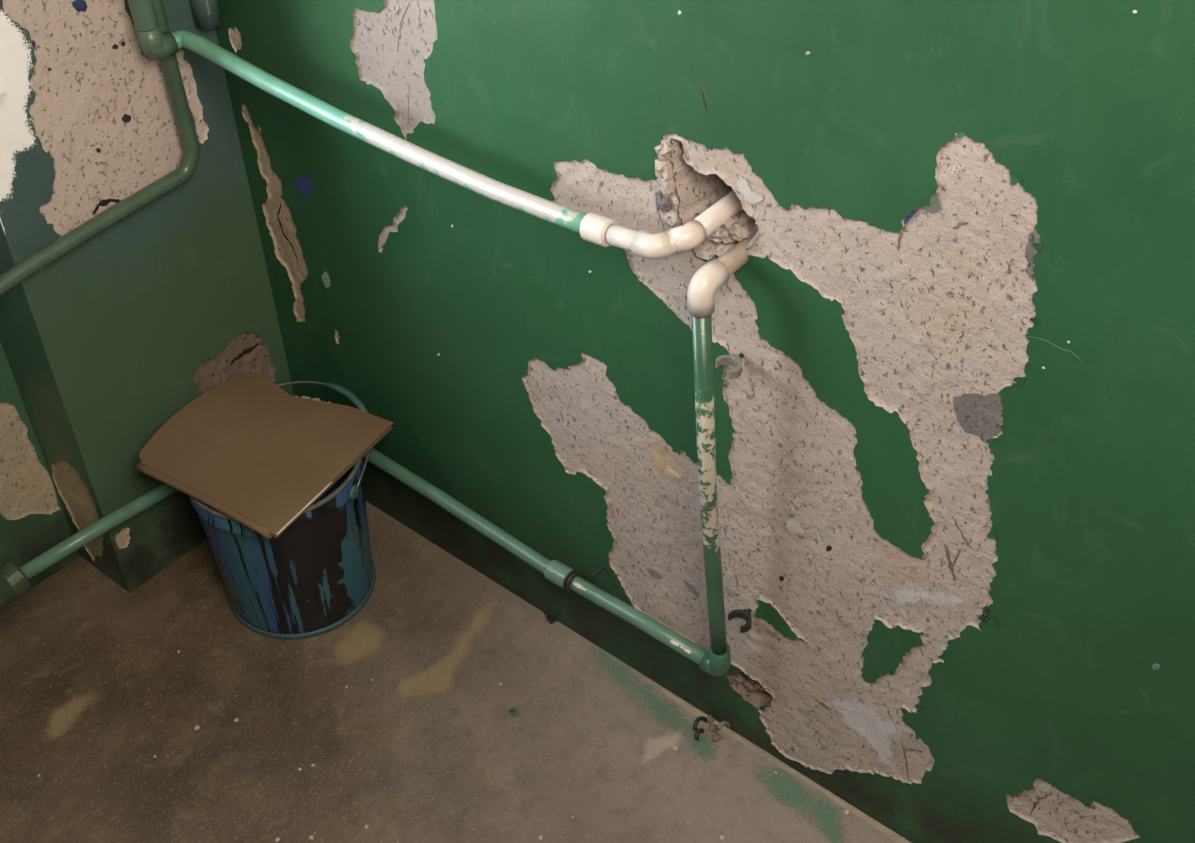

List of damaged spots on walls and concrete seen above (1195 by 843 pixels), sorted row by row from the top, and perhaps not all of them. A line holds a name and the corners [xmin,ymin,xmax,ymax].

peeling [0,0,183,237]
peeling [176,50,209,144]
peeling [350,0,437,141]
peeling [242,104,308,322]
peeling [0,402,131,561]
peeling [522,129,1044,788]
peeling [1006,778,1140,843]